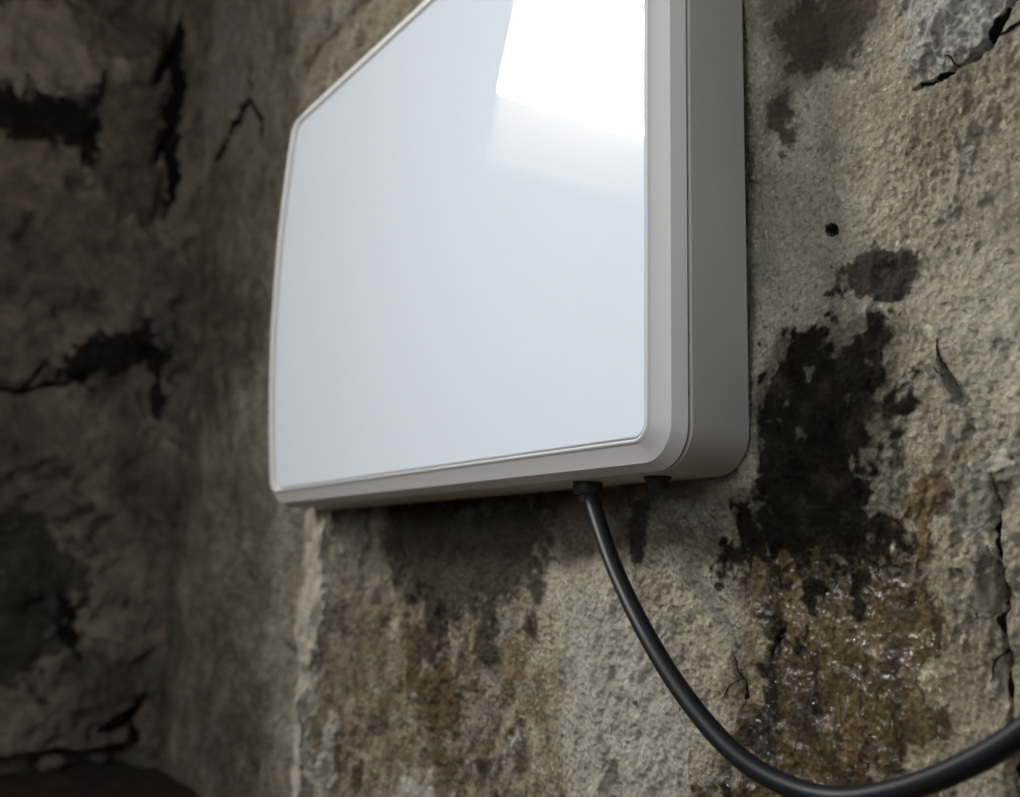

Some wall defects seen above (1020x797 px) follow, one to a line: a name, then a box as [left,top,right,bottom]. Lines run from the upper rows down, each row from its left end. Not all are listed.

crack [153,13,188,221]
crack [213,53,264,161]
crack [920,54,961,89]
crack [988,0,1020,46]
crack [0,363,76,395]
damp [709,242,950,786]
crack [990,494,1015,714]
damp [557,586,706,797]
damp [719,772,784,797]